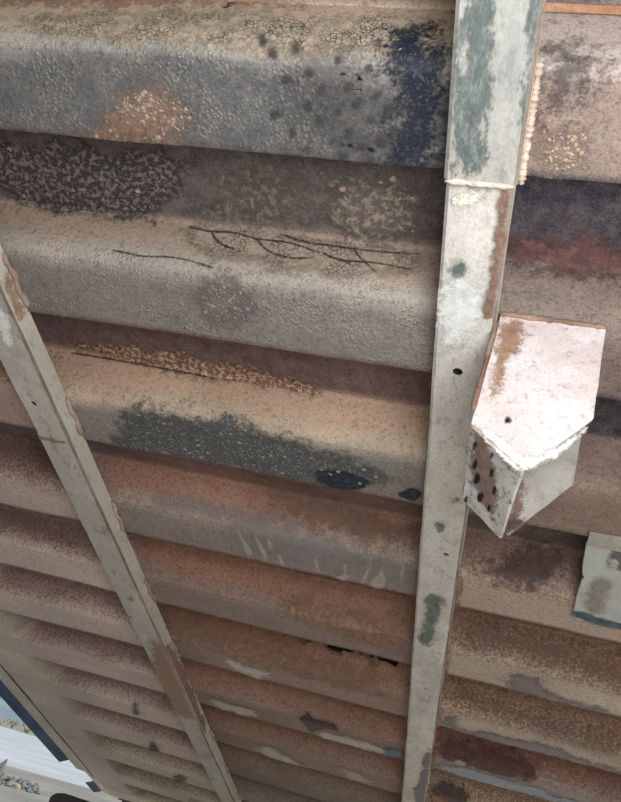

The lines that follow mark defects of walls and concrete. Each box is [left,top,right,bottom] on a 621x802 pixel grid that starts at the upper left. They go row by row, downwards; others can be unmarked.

rust [1,0,185,11]
peeling [0,8,450,248]
crack [113,216,419,279]
rust [482,190,621,395]
peeling [73,340,323,396]
leakage [473,538,565,593]